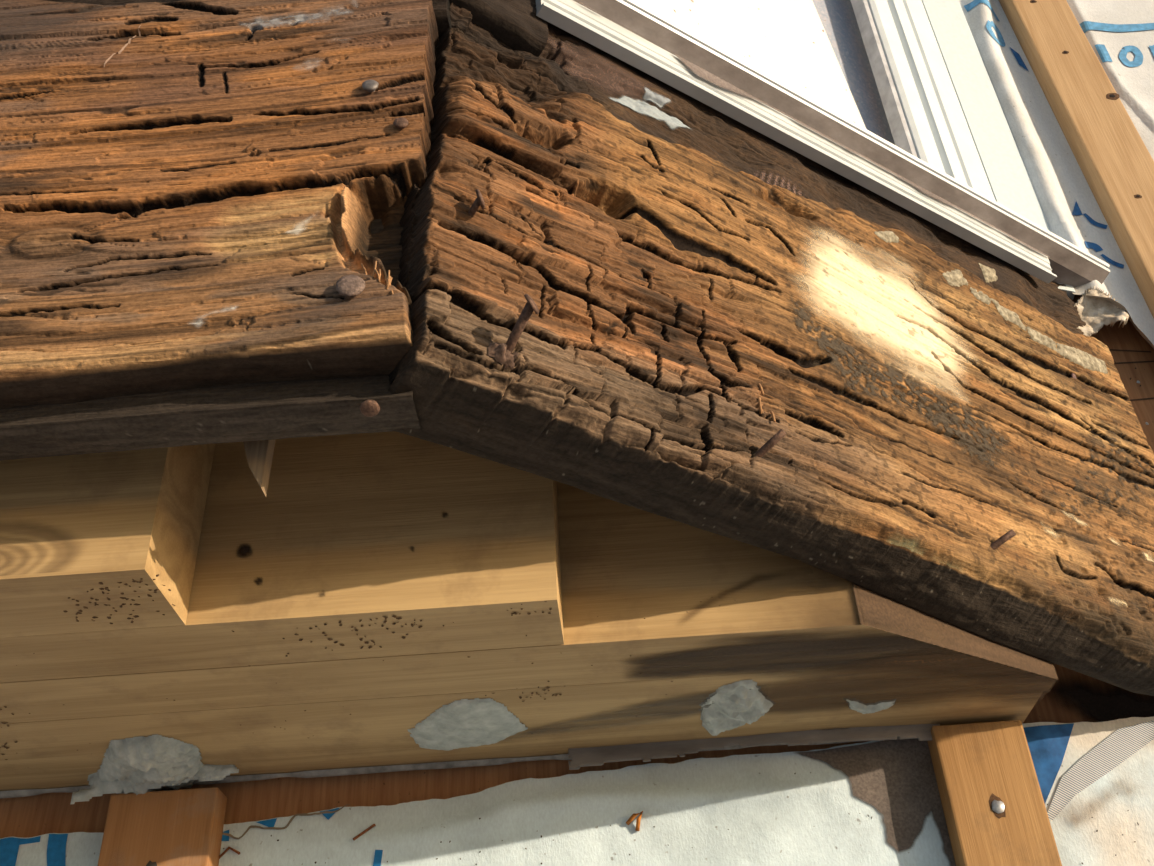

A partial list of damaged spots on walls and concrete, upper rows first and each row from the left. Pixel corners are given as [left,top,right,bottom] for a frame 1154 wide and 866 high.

crack [0,90,53,100]
crack [30,3,318,135]
crack [263,74,425,152]
crack [0,162,407,317]
crack [412,86,1154,518]
crack [1056,559,1154,599]
leakage [631,578,1154,722]